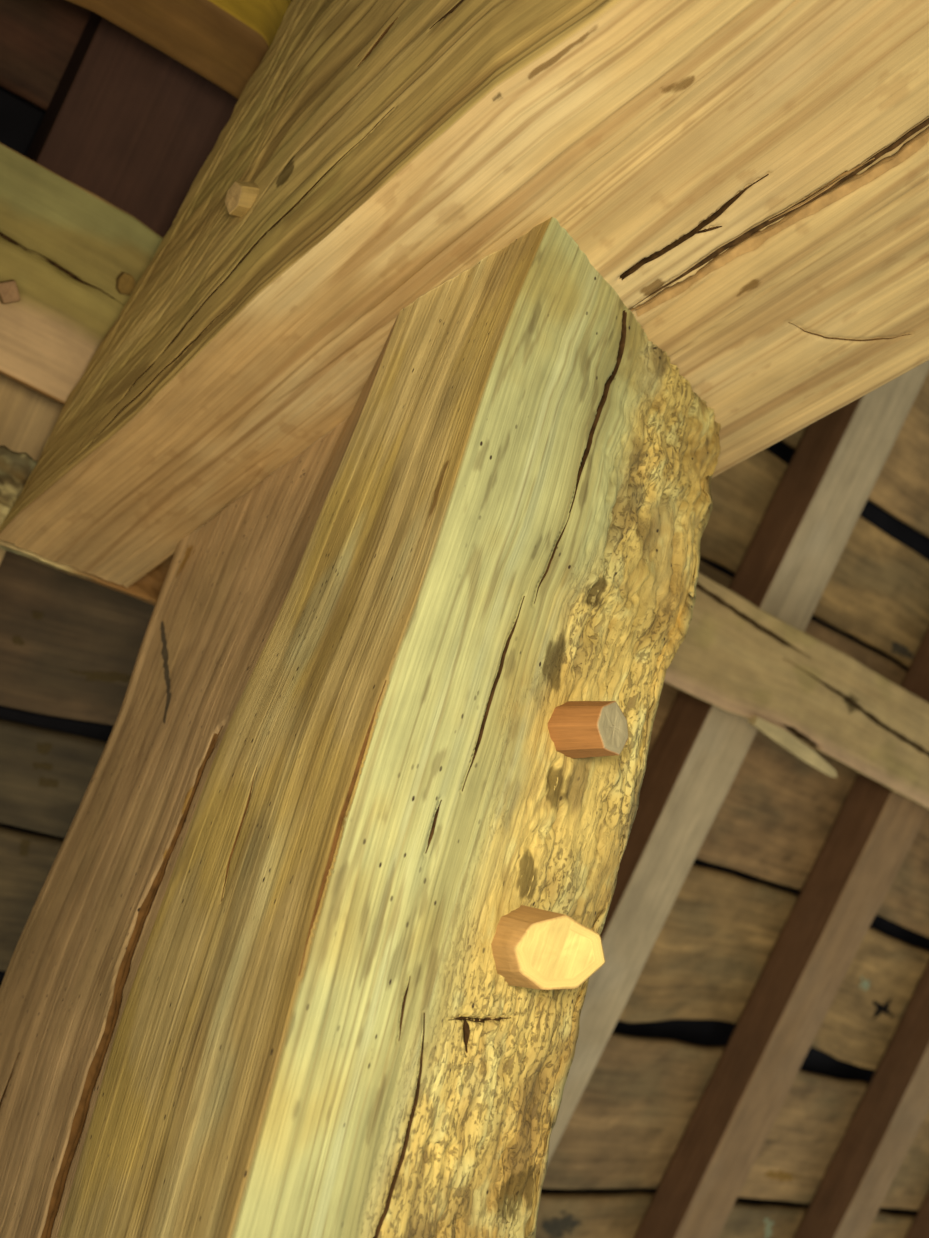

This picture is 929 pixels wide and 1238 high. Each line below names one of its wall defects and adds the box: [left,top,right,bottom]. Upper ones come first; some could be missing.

crack [358,17,398,66]
crack [430,0,464,29]
crack [0,232,125,306]
crack [425,118,929,853]
crack [41,726,223,1238]
crack [0,1052,20,1107]
crack [373,976,511,1238]